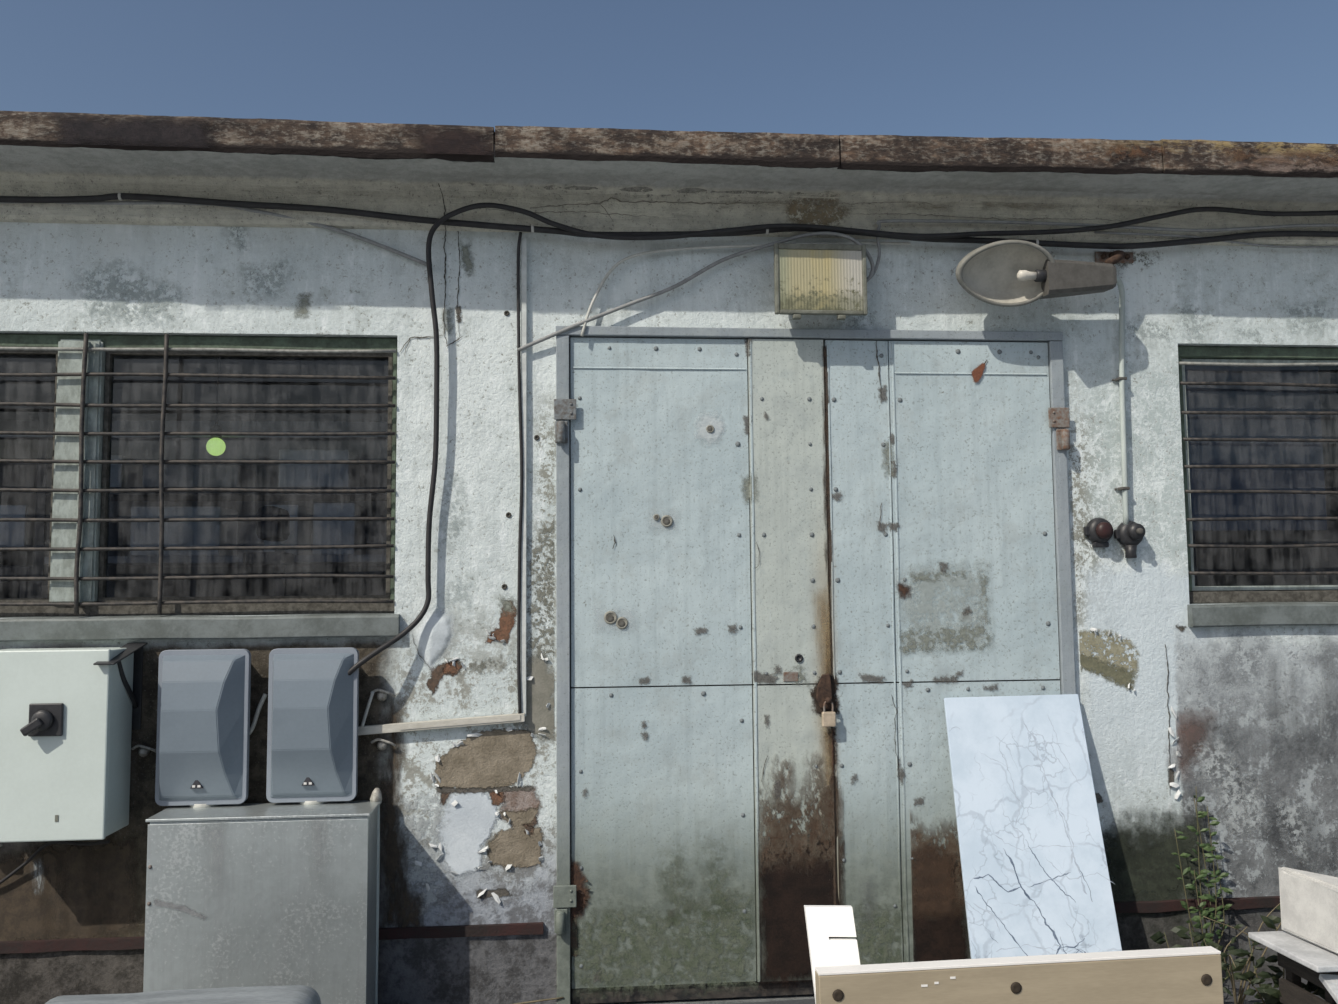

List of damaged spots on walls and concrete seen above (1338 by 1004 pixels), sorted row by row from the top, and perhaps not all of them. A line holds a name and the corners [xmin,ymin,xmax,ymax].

leakage [57,114,209,148]
leakage [415,130,491,155]
leakage [787,198,847,226]
corrosion [972,360,987,382]
corrosion [758,346,844,989]
peeling [1079,628,1139,691]
flaking render [403,518,554,916]
leakage [1198,741,1264,835]
leakage [1279,800,1309,859]
leakage [0,837,136,941]
corrosion [910,817,969,962]